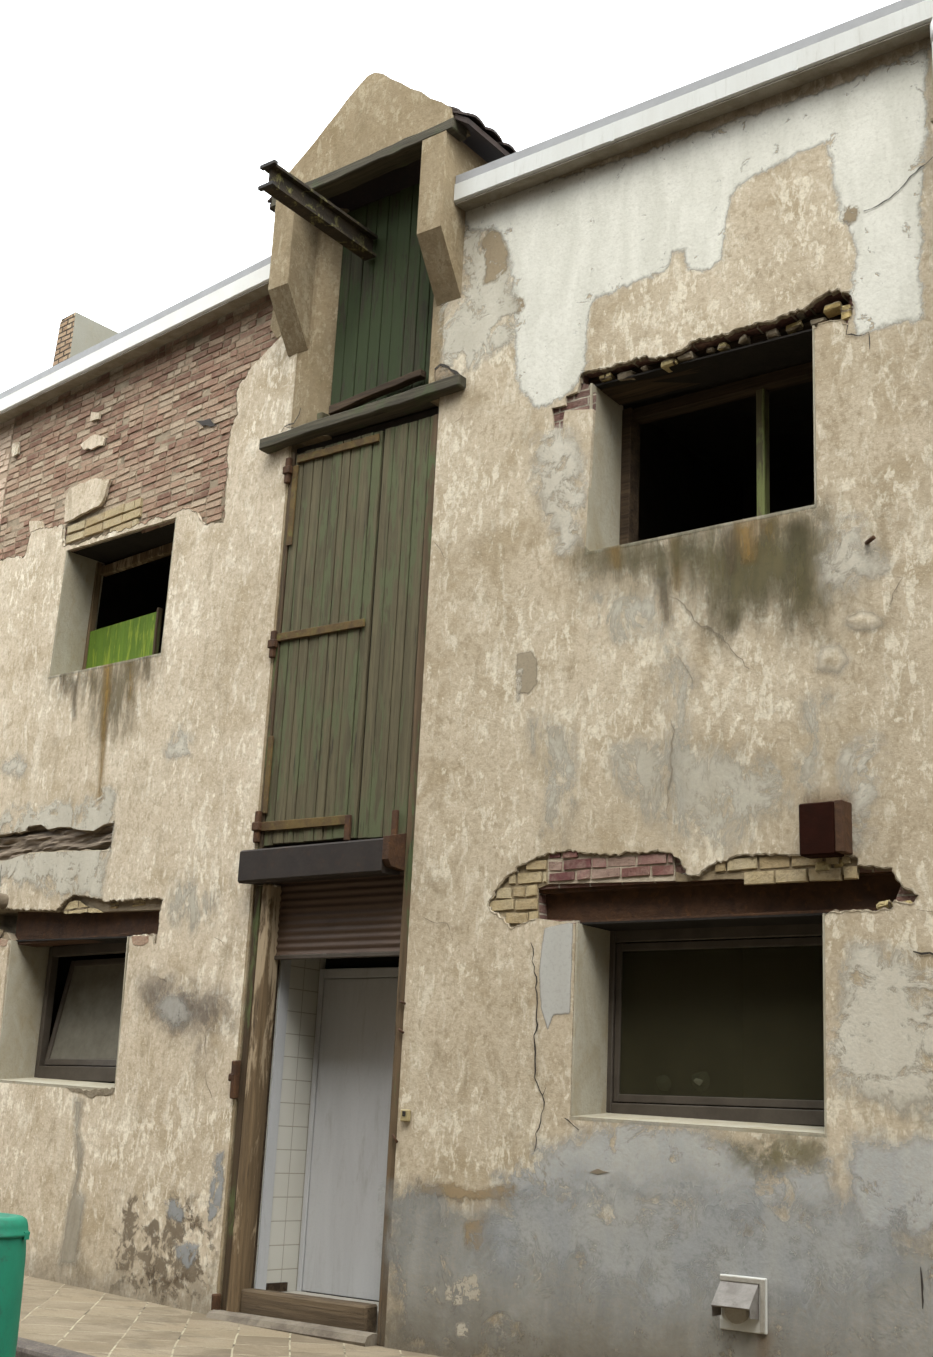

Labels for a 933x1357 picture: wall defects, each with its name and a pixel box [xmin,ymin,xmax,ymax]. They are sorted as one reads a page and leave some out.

peeling [434,49,928,555]
spalling [0,369,250,561]
water stain [585,520,828,628]
crack [667,595,749,669]
peeling [0,787,211,947]
water stain [63,660,149,796]
crack [666,723,675,820]
spalling [487,741,919,929]
crack [531,944,579,1152]
peeling [829,944,933,1113]
water stain [738,1137,820,1171]
peeling [389,1125,933,1357]